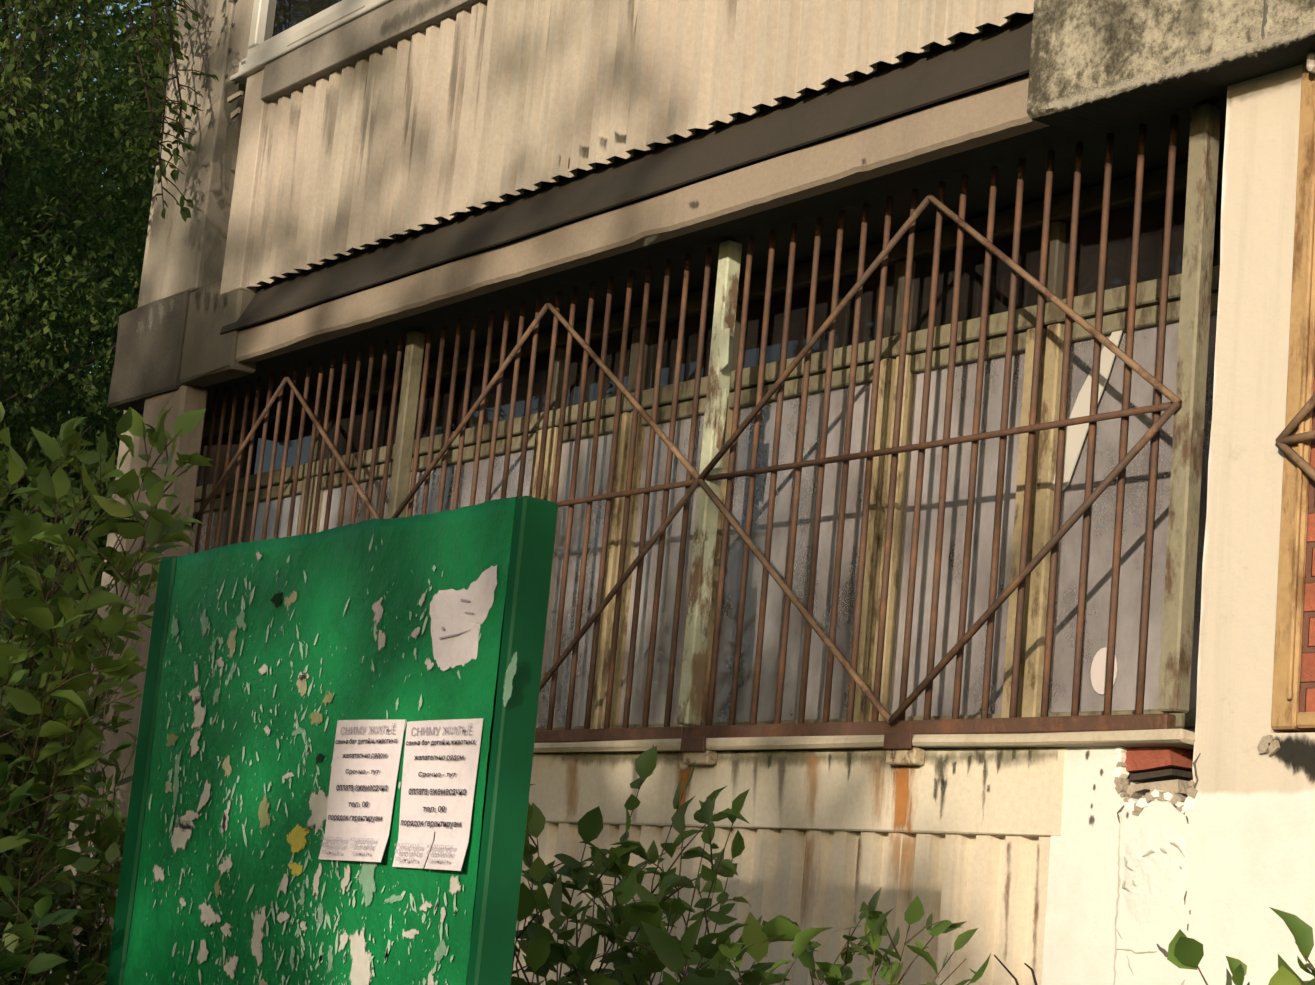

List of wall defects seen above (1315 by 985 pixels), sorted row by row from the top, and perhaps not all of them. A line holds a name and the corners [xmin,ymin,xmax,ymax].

peeling [716,328,730,372]
peeling [715,388,728,450]
peeling [700,539,715,646]
corrosion [690,650,708,725]
leakage [563,752,641,781]
leakage [720,751,887,792]
leakage [924,750,1045,812]
spalling [1111,746,1201,823]
leakage [1268,736,1315,781]
corrosion [876,766,913,871]
crack [1113,816,1191,985]